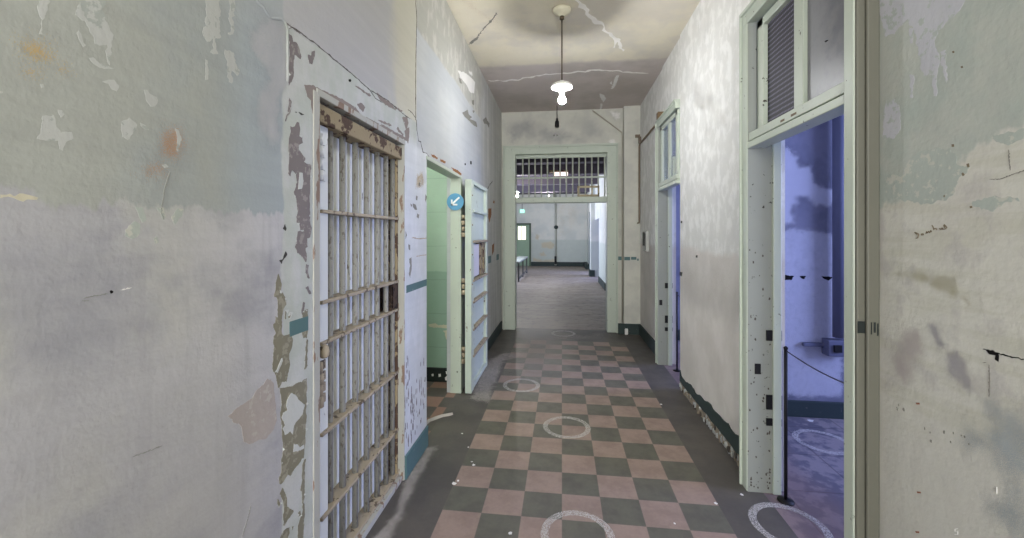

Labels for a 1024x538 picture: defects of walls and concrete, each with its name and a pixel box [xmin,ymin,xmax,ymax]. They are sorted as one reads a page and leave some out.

peeling [75,0,119,91]
peeling [202,0,240,83]
crack [488,0,648,82]
peeling [880,0,965,98]
peeling [37,110,73,150]
peeling [882,99,901,139]
peeling [885,144,970,205]
peeling [228,23,409,538]
crack [983,349,1024,396]
flaking render [679,382,771,467]